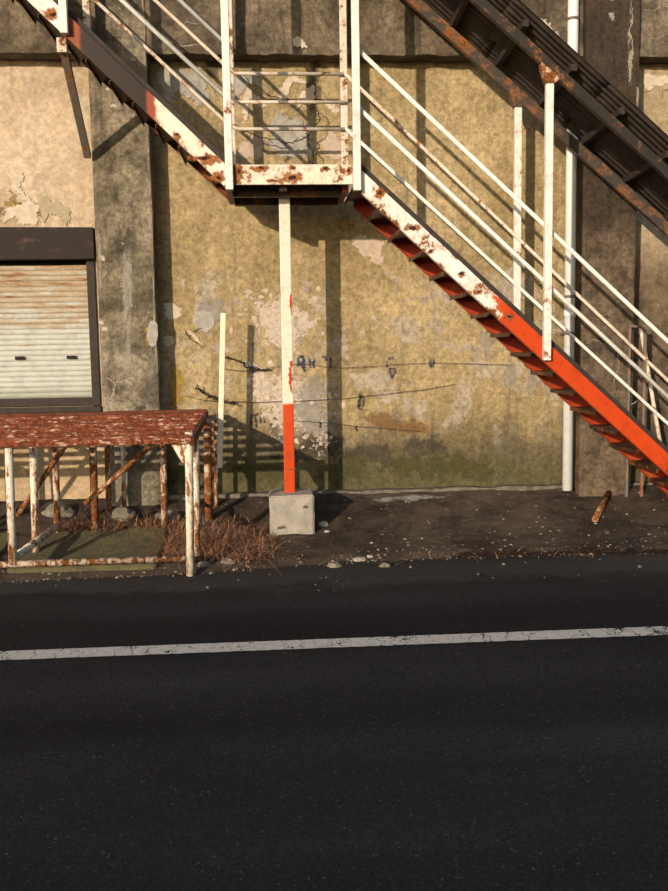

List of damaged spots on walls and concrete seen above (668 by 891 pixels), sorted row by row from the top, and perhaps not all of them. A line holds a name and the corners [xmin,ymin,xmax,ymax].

rust [42,7,57,21]
peeling [157,66,211,107]
peeling [641,73,668,91]
peeling [234,75,341,161]
rust [187,152,225,182]
leakage [296,432,395,464]
leakage [402,436,448,457]